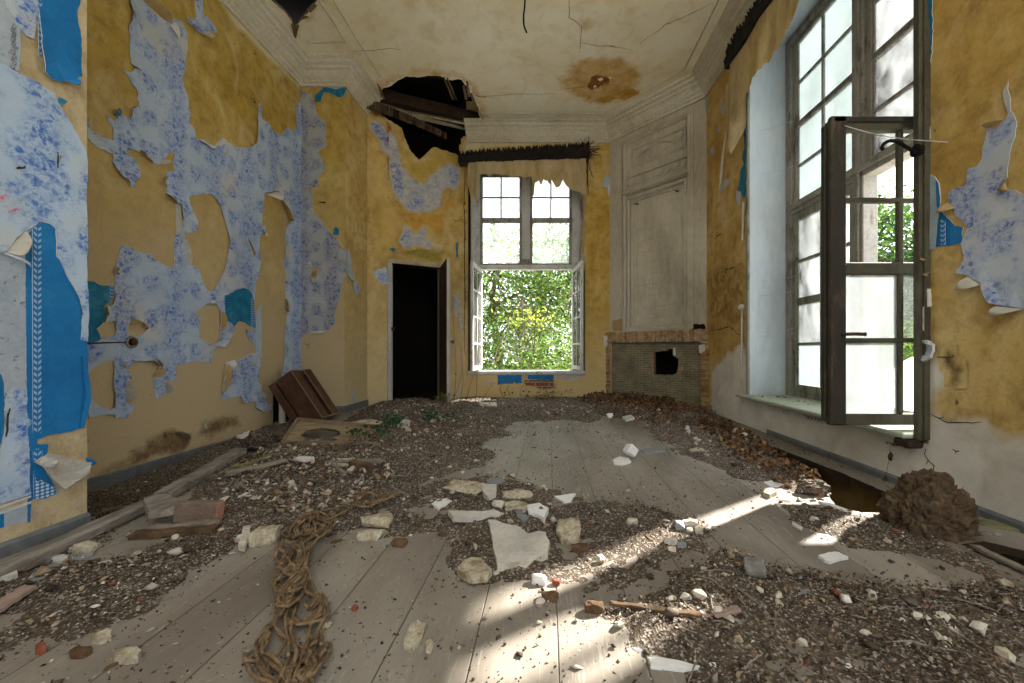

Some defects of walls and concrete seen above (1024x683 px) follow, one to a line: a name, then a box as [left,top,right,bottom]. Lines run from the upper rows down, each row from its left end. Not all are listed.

crack [569,0,710,53]
damp [554,54,652,107]
peeling [390,161,427,210]
damp [193,410,245,446]